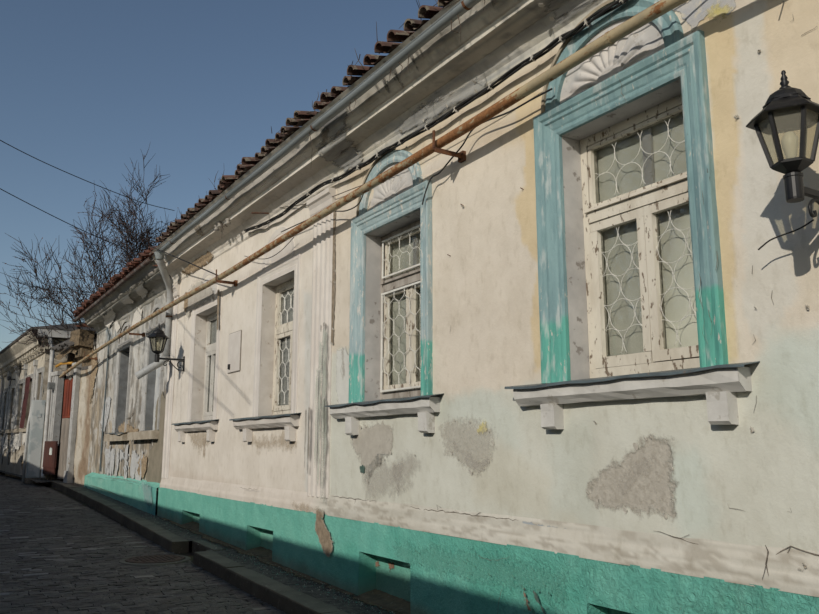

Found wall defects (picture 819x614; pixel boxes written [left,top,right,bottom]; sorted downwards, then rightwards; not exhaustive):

peeling [673,0,736,32]
peeling [105,421,152,506]
peeling [351,422,393,483]
peeling [586,435,677,519]
spalling [314,508,333,557]
crack [762,545,819,579]